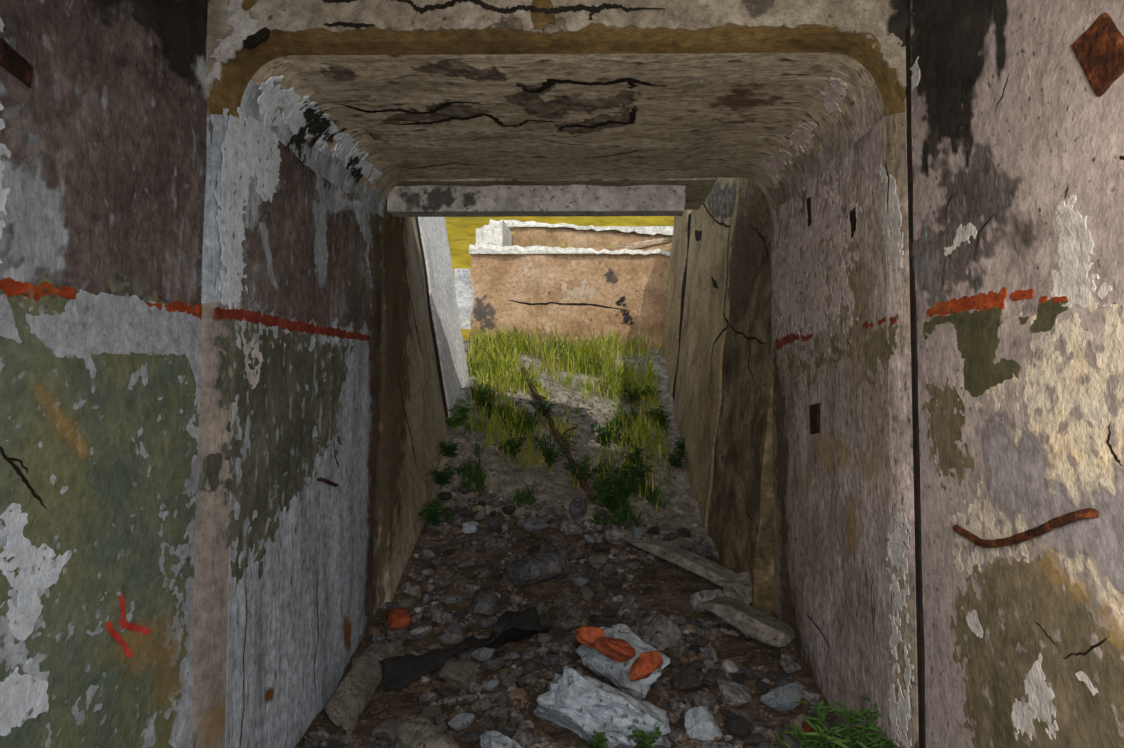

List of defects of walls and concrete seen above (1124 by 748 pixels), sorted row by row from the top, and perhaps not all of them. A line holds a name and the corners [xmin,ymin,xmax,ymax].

crack [323,0,376,29]
crack [391,0,665,20]
leakage [991,0,1007,77]
crack [334,78,667,159]
leakage [946,80,973,167]
peeling [0,75,383,748]
crack [0,446,47,510]
peeling [922,195,1124,748]